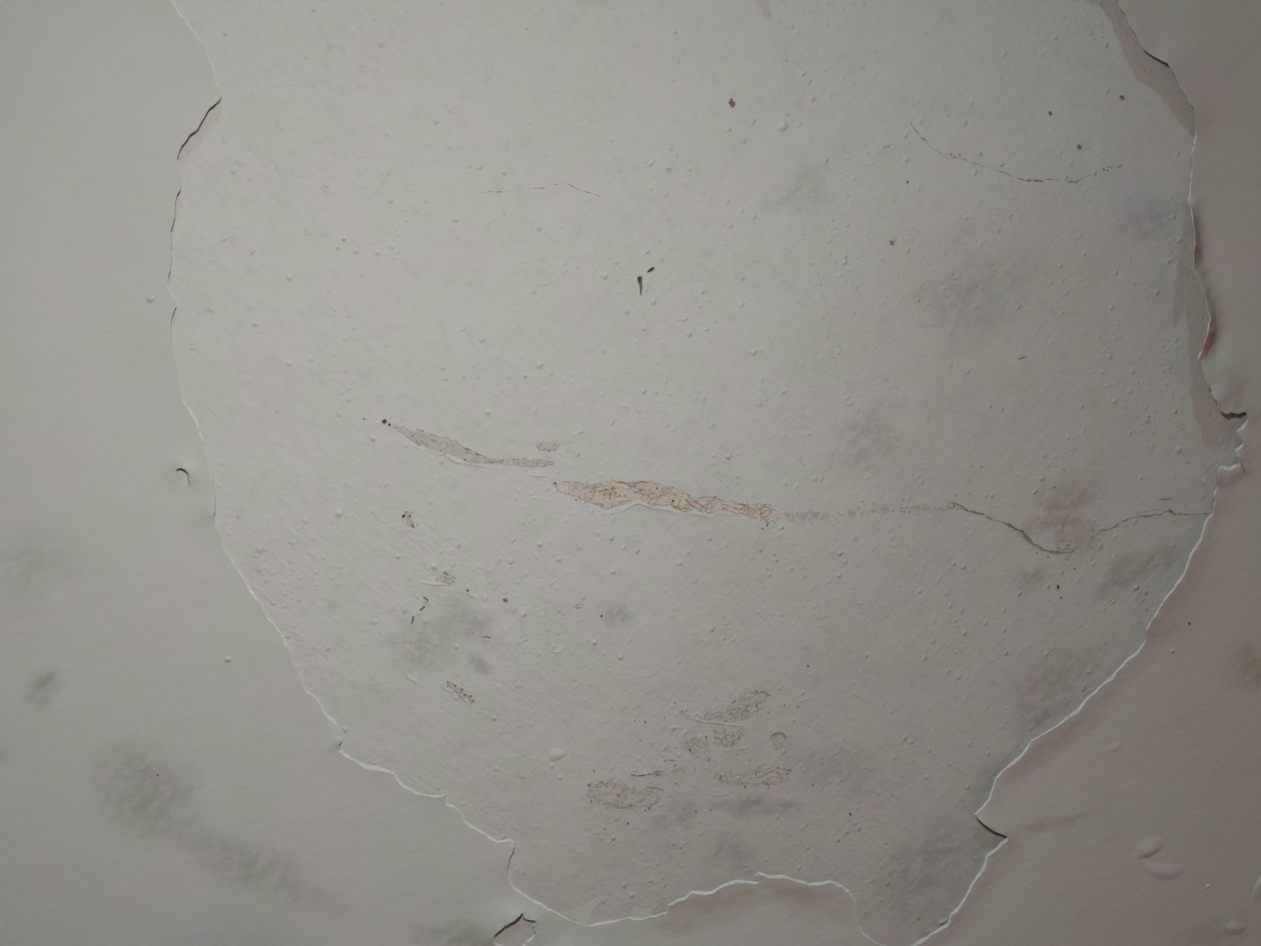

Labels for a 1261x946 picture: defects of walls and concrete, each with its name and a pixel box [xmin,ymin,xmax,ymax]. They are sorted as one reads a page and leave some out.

peeling [177,468,190,485]
crack [363,418,1209,569]
peeling [1145,501,1215,634]
spalling [714,729,744,747]
spalling [704,690,771,721]
peeling [974,638,1146,818]
peeling [339,747,446,798]
spalling [588,780,659,810]
spalling [715,767,792,787]
peeling [649,872,857,917]
peeling [911,836,1009,946]
peeling [493,913,536,946]